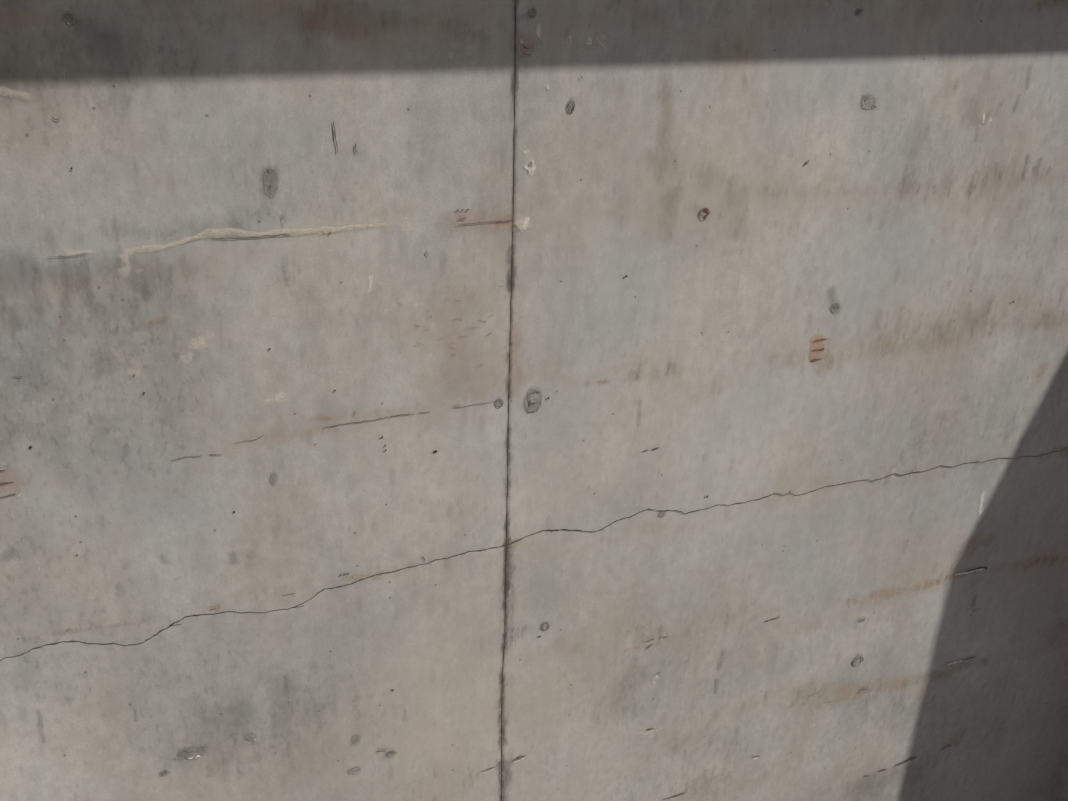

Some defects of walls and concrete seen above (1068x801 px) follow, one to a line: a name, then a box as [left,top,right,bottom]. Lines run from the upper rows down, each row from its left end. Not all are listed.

crack [0,447,1068,661]